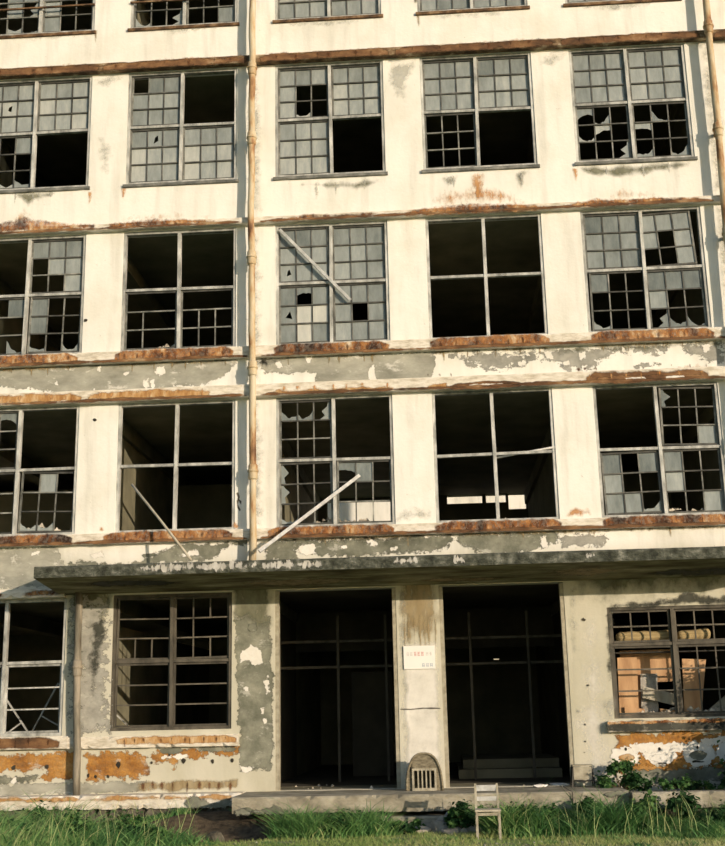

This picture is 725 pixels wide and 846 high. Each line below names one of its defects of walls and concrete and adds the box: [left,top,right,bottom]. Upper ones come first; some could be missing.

rust [0,56,247,75]
rust [0,217,239,234]
rust [260,176,714,222]
peeling [0,359,237,392]
peeling [261,343,701,390]
rust [0,523,247,547]
peeling [0,531,609,589]
damp [73,580,174,674]
damp [401,577,501,645]
damp [556,567,725,671]
peeling [0,594,275,785]
spalling [615,730,725,786]